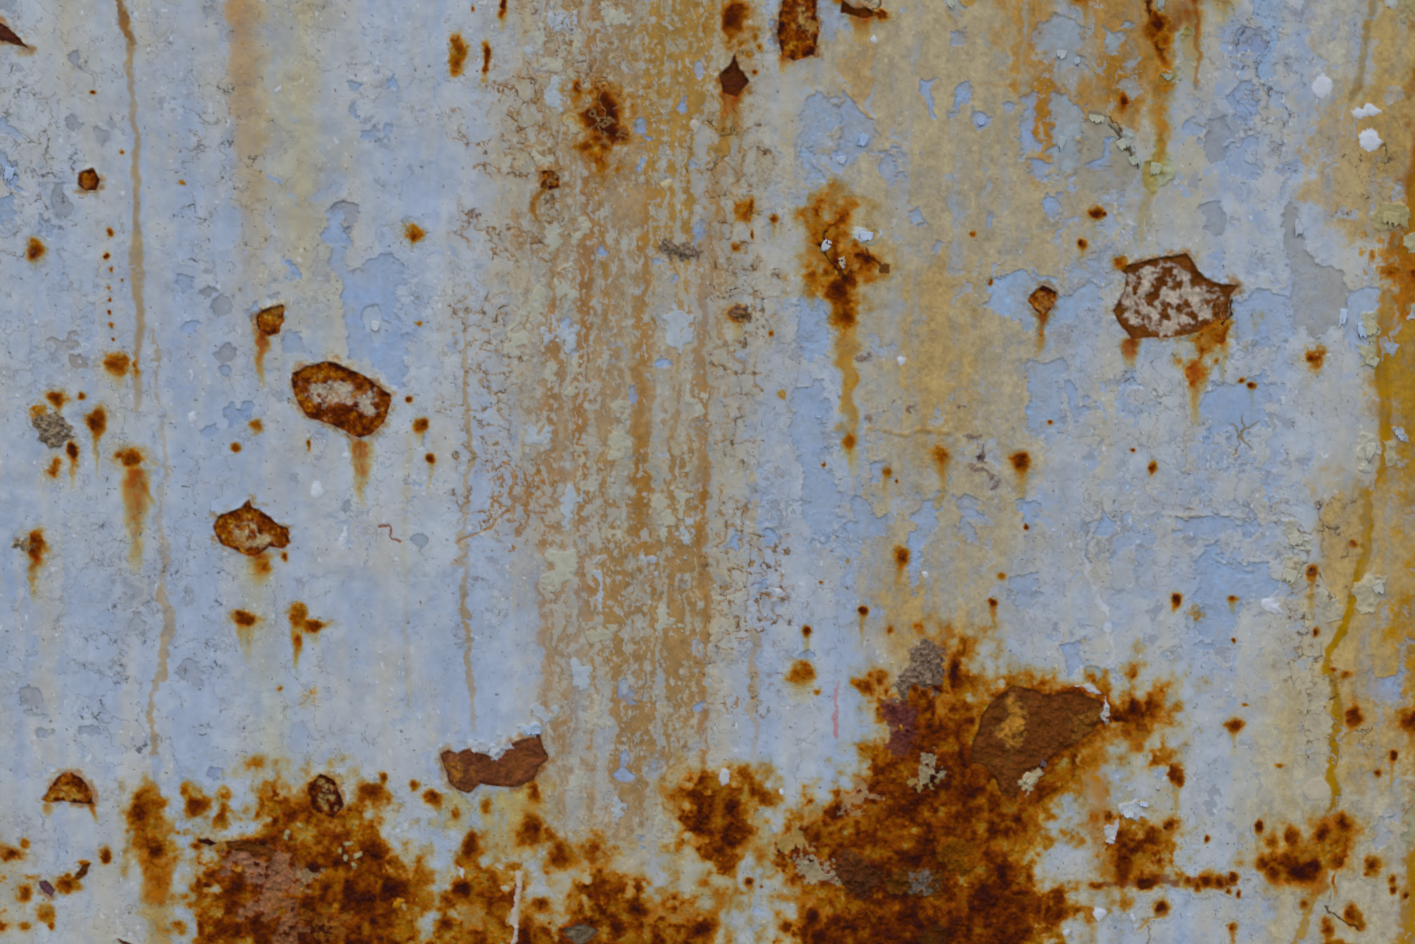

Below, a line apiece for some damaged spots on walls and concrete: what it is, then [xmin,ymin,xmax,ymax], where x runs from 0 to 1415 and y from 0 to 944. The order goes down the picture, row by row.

corrosion [21,230,52,268]
corrosion [85,0,149,414]
spalling [766,0,900,75]
peeling [791,87,908,190]
peeling [917,11,1162,227]
spalling [982,195,1401,448]
peeling [1181,0,1290,239]
corrosion [154,0,1245,944]
corrosion [1067,0,1415,944]
corrosion [24,327,240,944]
peeling [1364,634,1415,707]
corrosion [0,831,62,940]